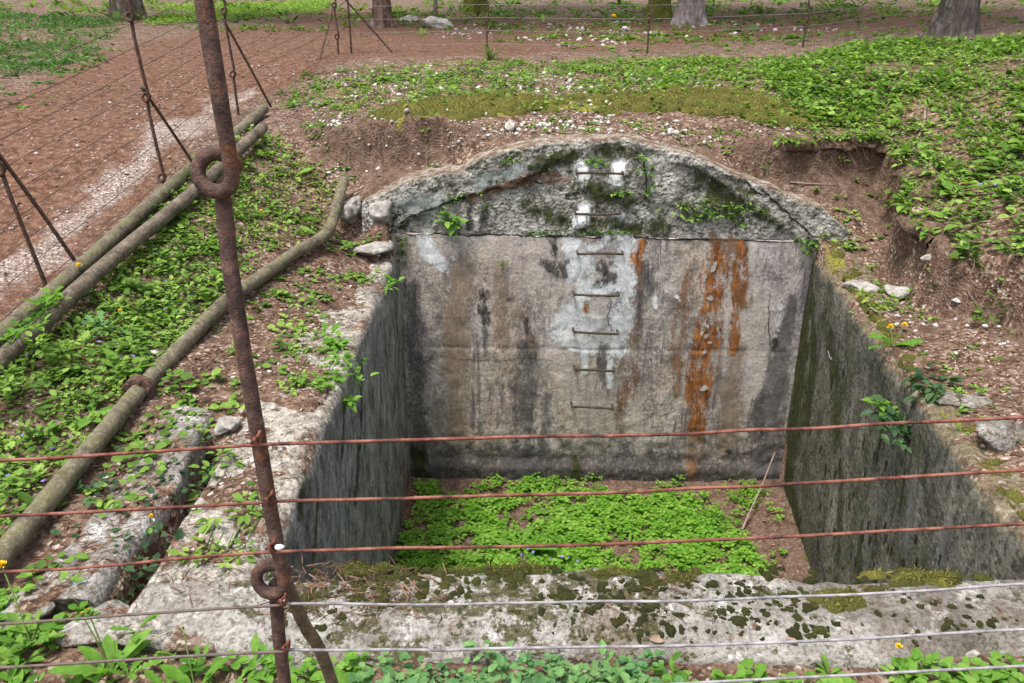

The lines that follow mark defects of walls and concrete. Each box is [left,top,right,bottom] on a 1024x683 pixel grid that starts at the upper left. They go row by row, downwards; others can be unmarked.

efflorescence [573,159,590,181]
crack [401,166,814,251]
efflorescence [608,157,629,186]
water stain [395,201,658,481]
corrosion [667,230,752,481]
water stain [341,365,363,543]
water stain [834,470,846,567]